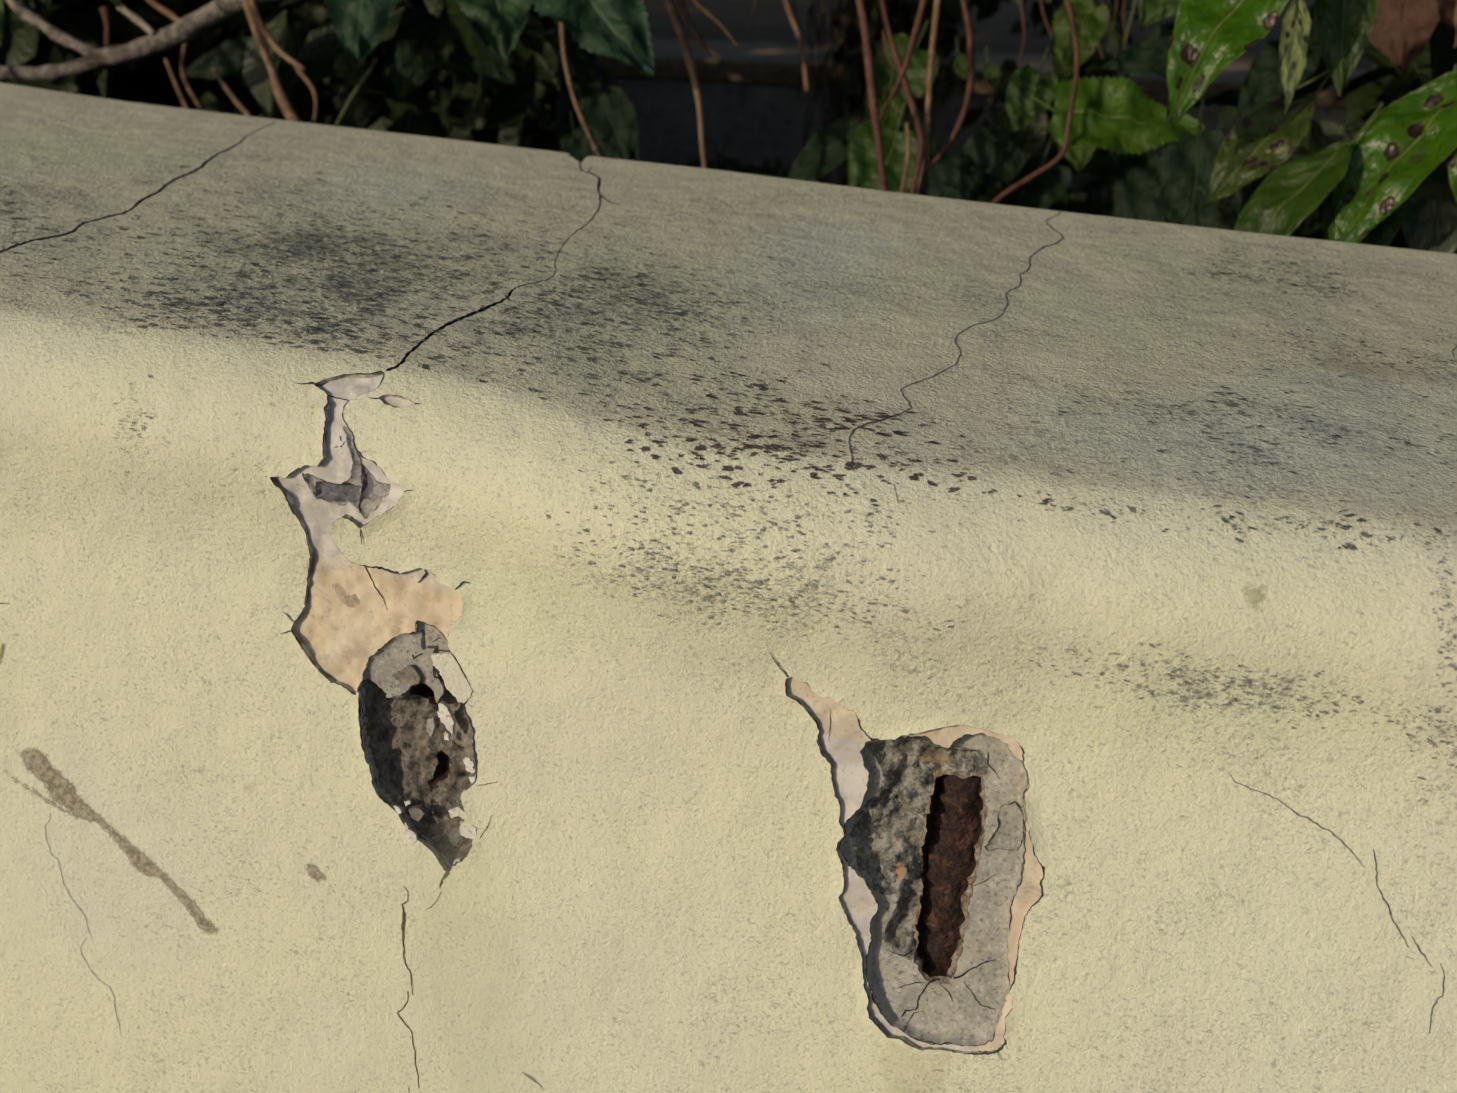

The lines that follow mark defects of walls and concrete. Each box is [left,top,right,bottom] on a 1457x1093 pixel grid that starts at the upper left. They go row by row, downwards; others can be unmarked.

crack [0,121,276,253]
crack [386,162,621,371]
crack [848,210,1064,468]
leakage [0,134,1457,817]
peeling [261,371,485,874]
crack [397,871,450,1093]
spalling [770,653,1056,1065]
crack [1228,772,1445,1034]